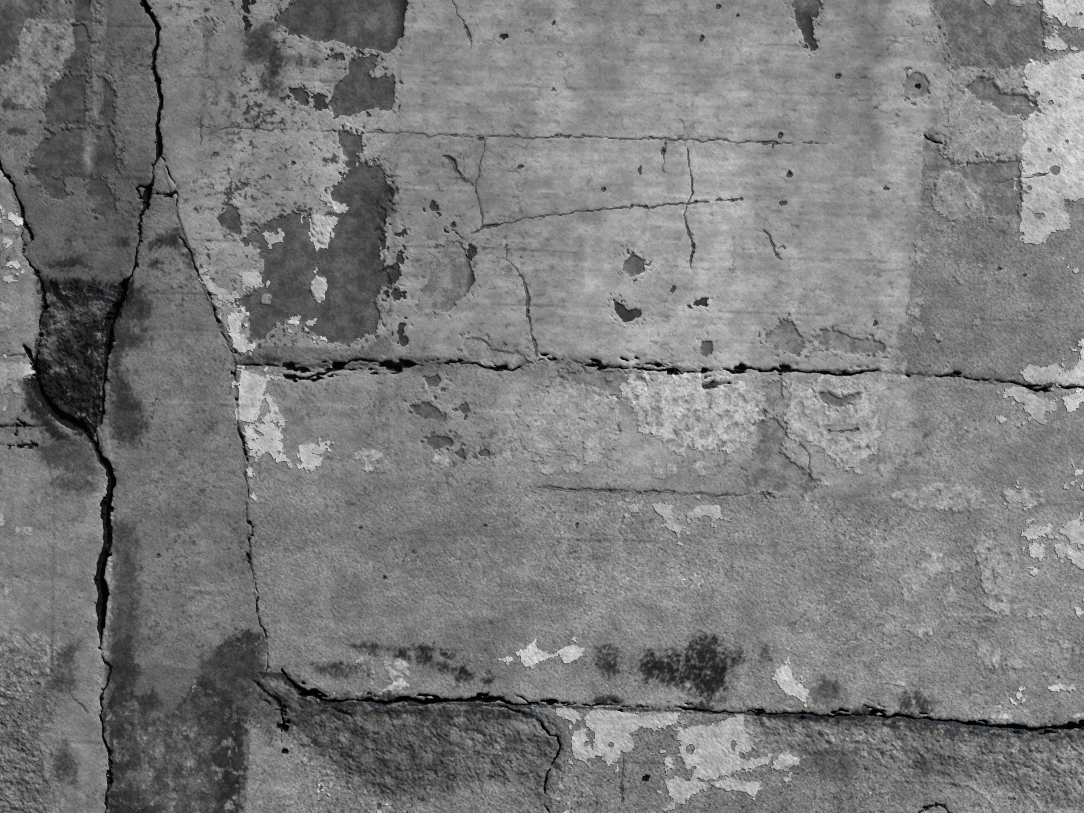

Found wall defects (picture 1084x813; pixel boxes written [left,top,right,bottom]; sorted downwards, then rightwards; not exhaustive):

crack [0,0,178,813]
damp [36,255,152,447]
peeling [199,0,477,477]
crack [179,129,824,400]
crack [585,357,879,390]
peeling [921,0,1084,245]
damp [37,520,285,813]
crack [246,488,648,812]
damp [594,693,644,711]
spalling [269,674,1084,813]
damp [640,635,743,710]
peeling [772,657,809,707]